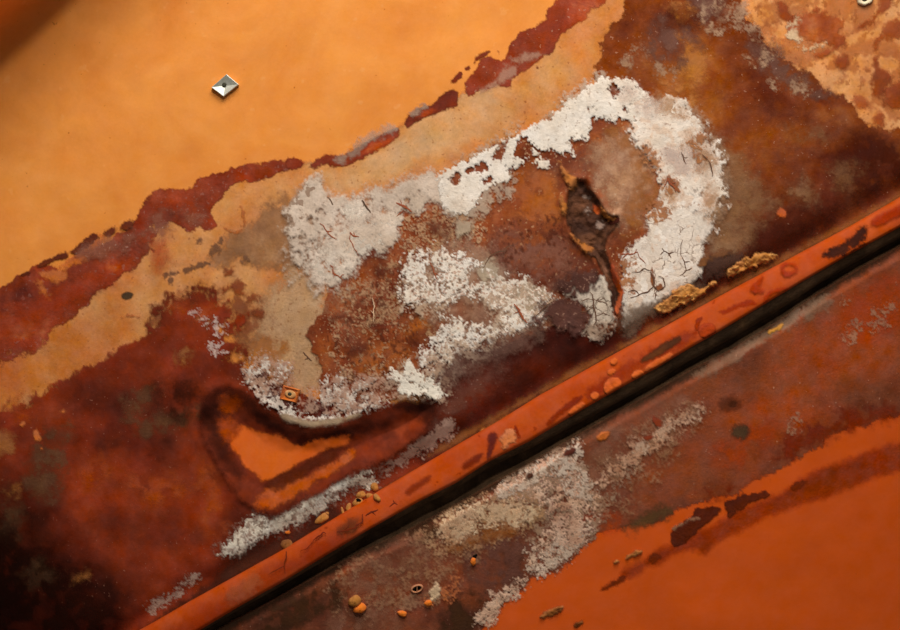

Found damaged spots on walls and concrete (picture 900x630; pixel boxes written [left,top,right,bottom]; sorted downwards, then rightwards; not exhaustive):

corrosion [0,0,605,361]
water stain [210,71,730,428]
corrosion [246,0,900,553]
spalling [559,161,624,313]
crack [621,240,692,298]
crack [665,152,713,191]
corrosion [0,285,341,630]
water stain [147,417,455,615]
corrosion [177,247,900,630]
water stain [424,402,711,627]
peeling [671,491,770,546]